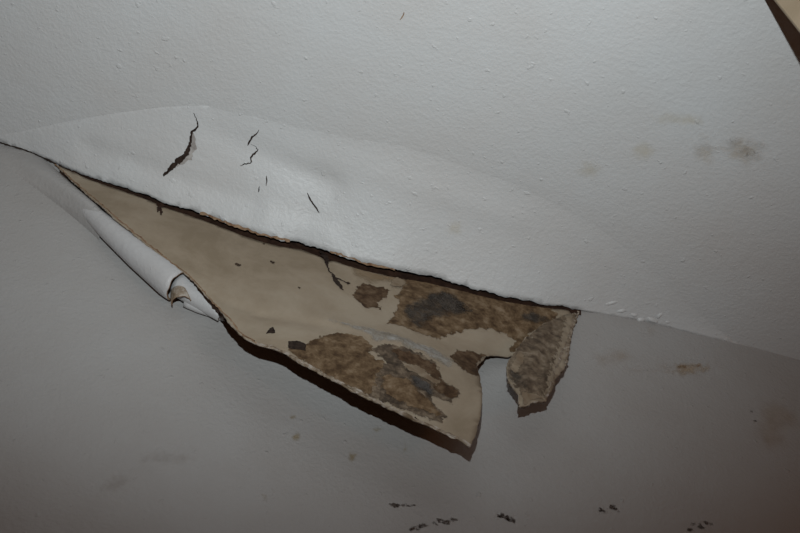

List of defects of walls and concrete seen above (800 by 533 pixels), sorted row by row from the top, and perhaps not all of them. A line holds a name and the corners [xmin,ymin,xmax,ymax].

crack [163,114,199,176]
crack [241,130,259,166]
flaking render [0,145,579,448]
water stain [288,333,460,422]
water stain [352,269,567,405]